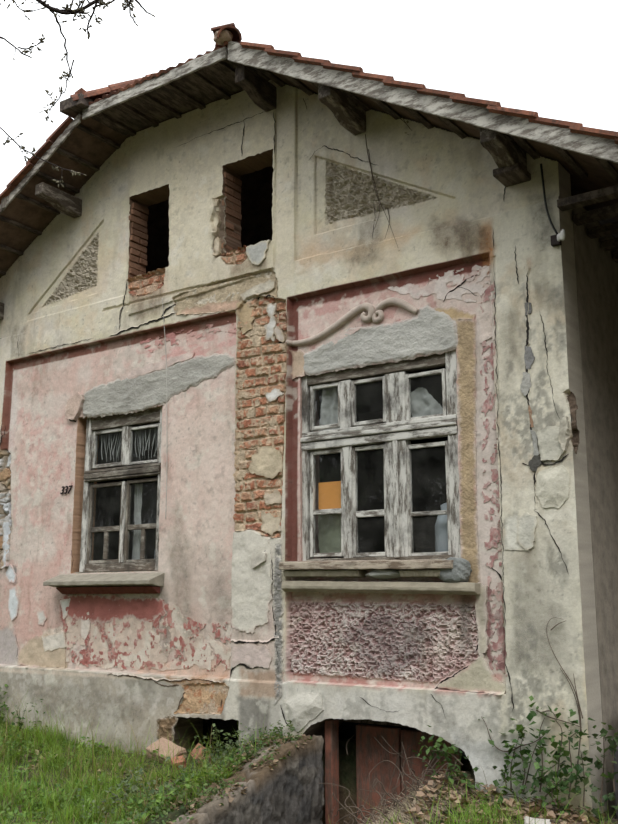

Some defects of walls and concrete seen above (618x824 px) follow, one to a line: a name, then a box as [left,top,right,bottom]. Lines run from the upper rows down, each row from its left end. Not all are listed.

flaking render [0,450,19,621]
crack [0,284,177,358]
flaking render [17,195,306,705]
flaking render [388,265,507,695]
crack [443,273,514,711]
crack [514,245,569,575]
flaking render [156,682,229,742]